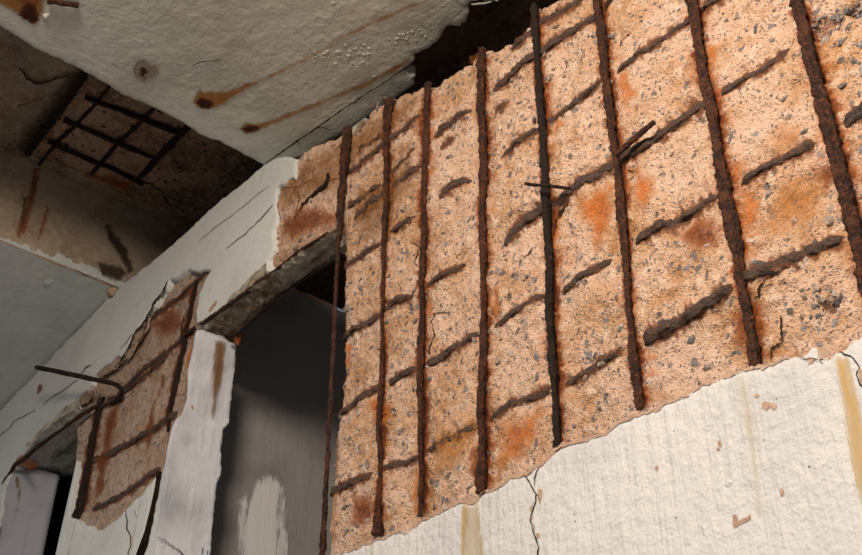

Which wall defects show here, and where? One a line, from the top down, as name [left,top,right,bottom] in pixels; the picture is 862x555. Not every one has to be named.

corrosion [0,0,43,24]
corrosion [194,82,257,109]
spalling [24,70,264,229]
spalling [195,0,862,555]
spalling [10,272,210,481]
spalling [71,329,197,530]
corrosion [212,322,245,413]
crack [770,315,822,363]
corrosion [837,358,862,489]
crack [840,351,862,387]
crack [125,460,184,555]
crack [524,468,540,555]